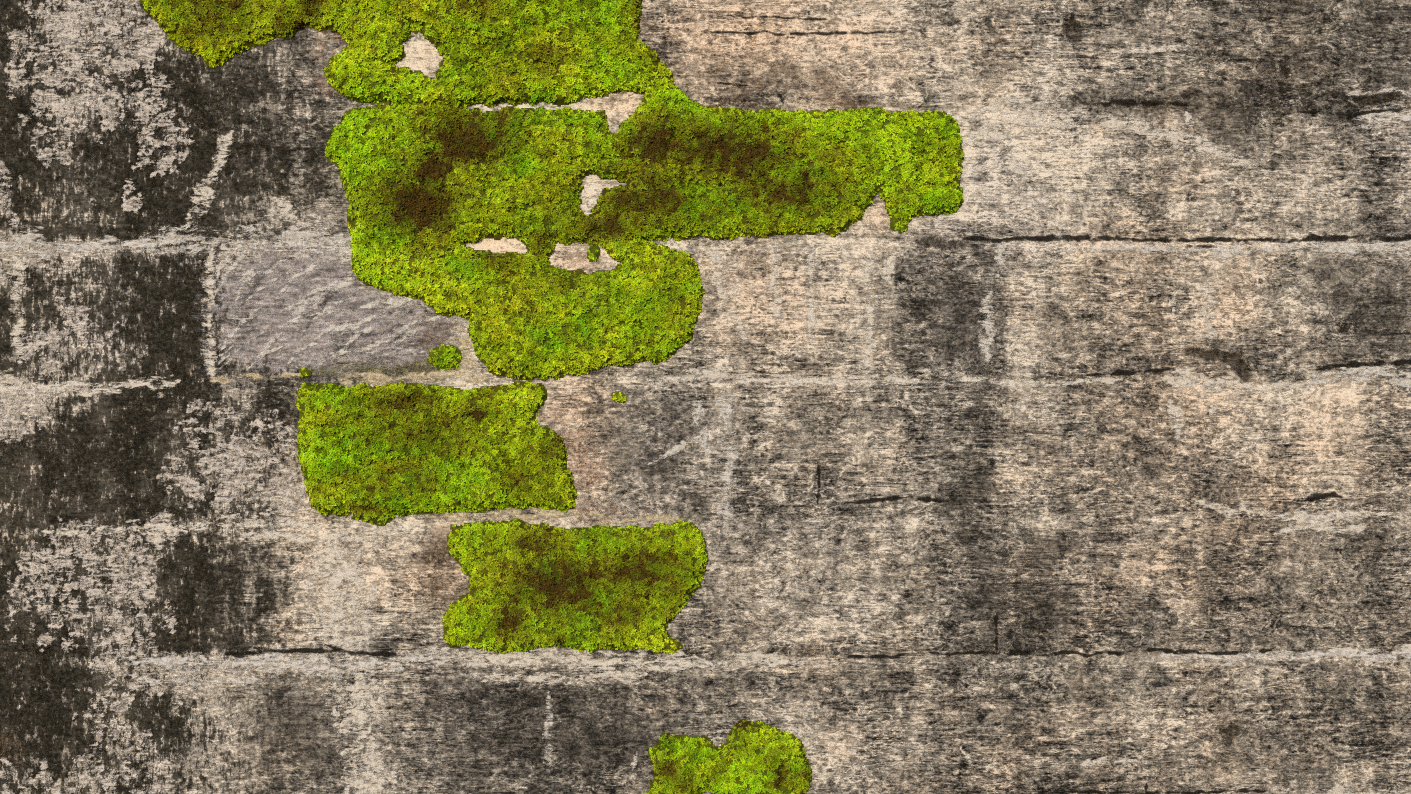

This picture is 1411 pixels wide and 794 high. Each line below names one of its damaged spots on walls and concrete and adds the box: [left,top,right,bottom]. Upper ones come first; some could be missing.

leakage [41,514,825,794]